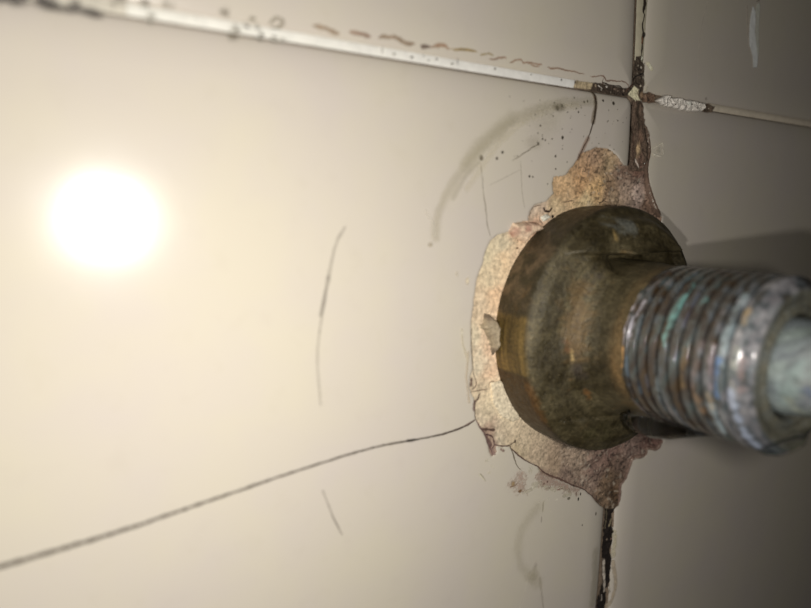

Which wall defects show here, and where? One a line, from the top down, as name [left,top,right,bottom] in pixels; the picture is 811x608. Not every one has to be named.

rust [312,24,629,87]
spalling [470,131,663,509]
crack [0,419,476,569]